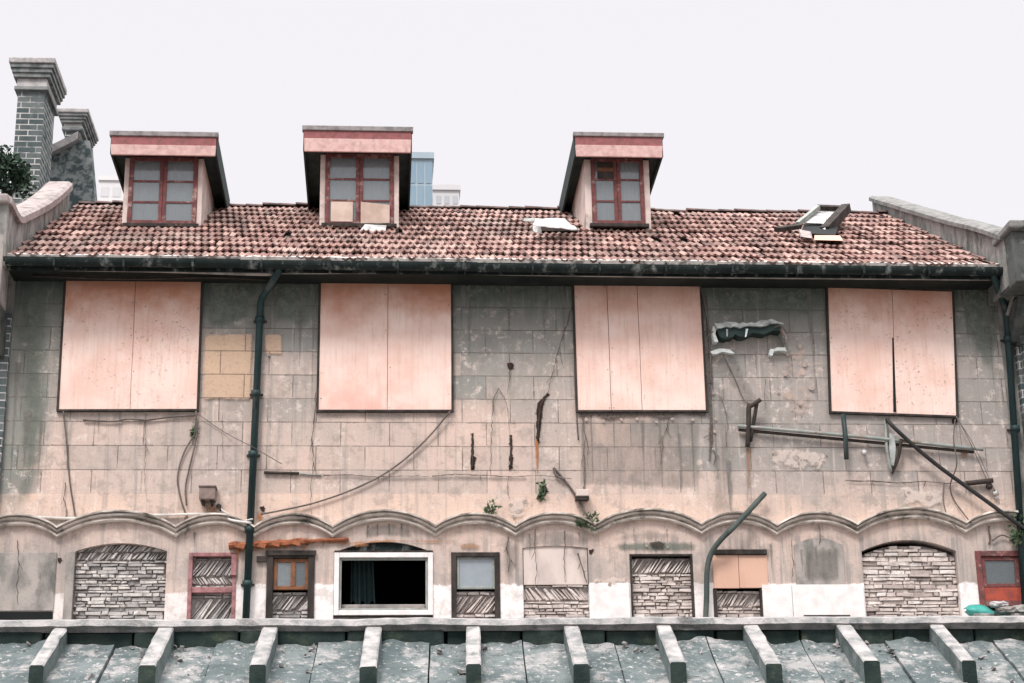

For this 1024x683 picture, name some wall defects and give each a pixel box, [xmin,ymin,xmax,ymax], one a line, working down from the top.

peeling [771,450,827,468]